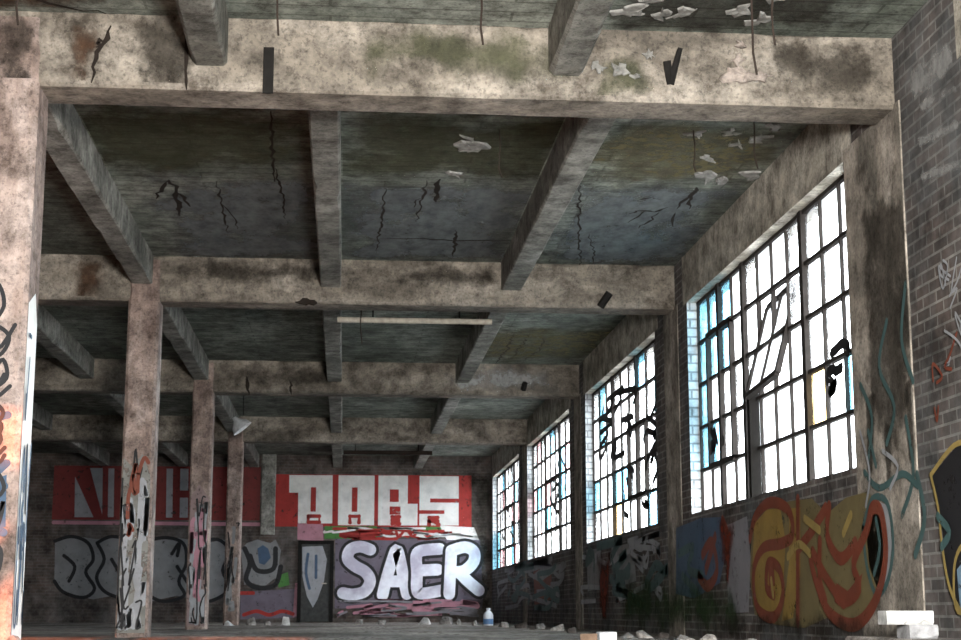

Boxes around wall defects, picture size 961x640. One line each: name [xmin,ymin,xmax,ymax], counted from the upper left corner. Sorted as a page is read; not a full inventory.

peeling [609,0,697,21]
peeling [725,0,783,27]
crack [37,0,111,83]
spalling [453,134,491,152]
crack [269,111,286,218]
crack [155,180,191,216]
crack [376,179,510,256]